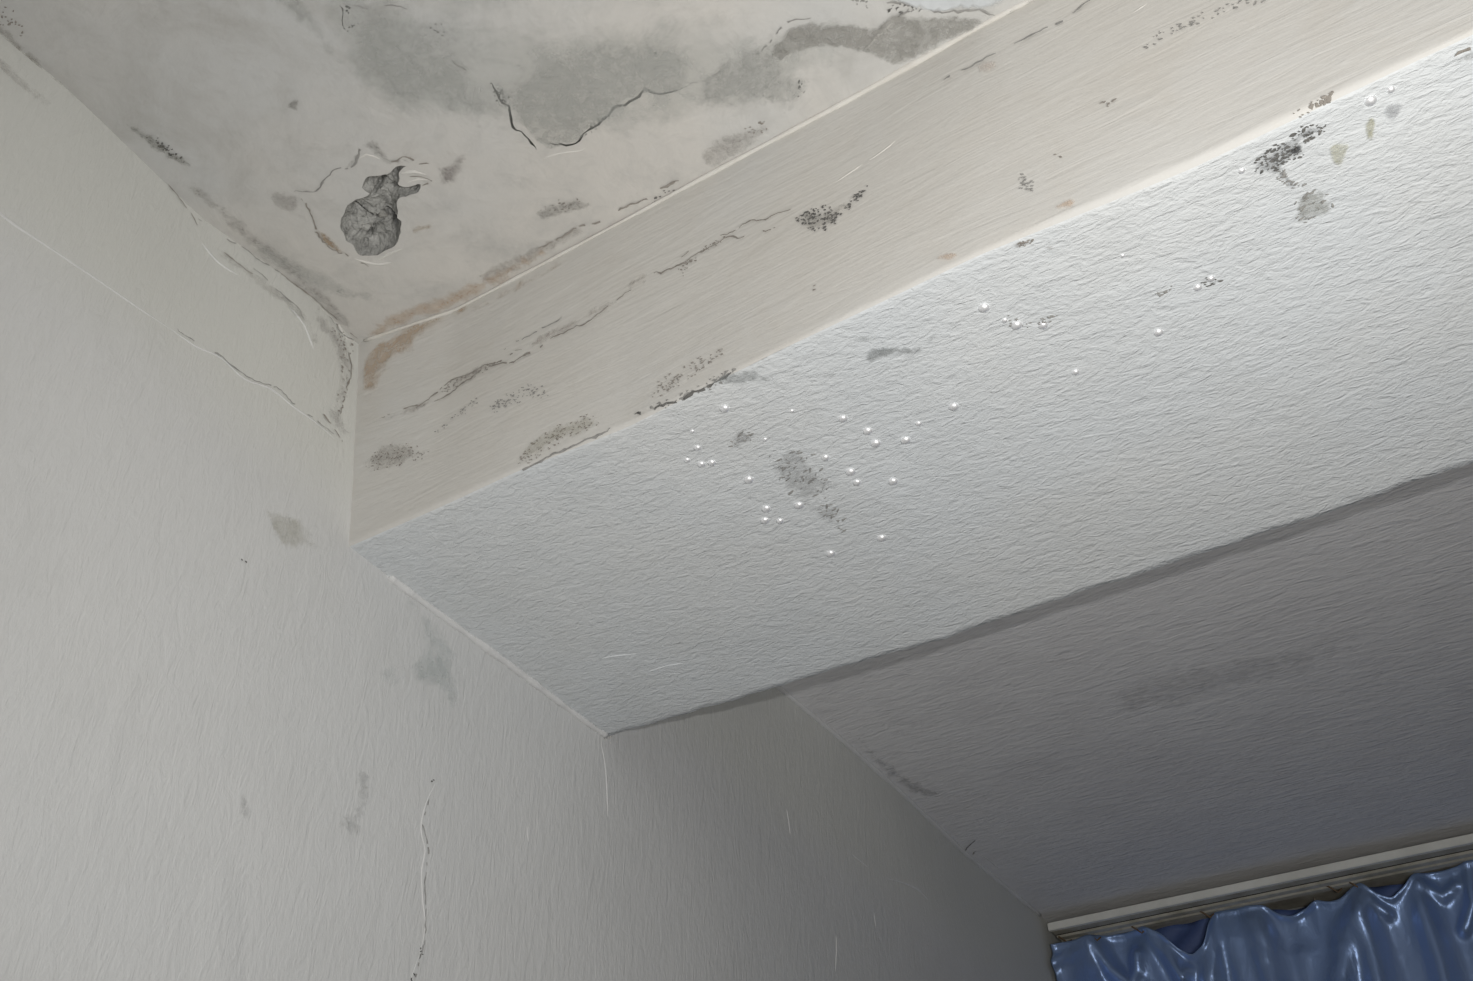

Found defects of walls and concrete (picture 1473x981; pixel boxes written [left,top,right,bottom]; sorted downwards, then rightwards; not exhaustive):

leakage [757,4,978,62]
peeling [888,0,998,16]
crack [453,61,721,159]
leakage [1254,91,1334,223]
flaking render [294,149,432,267]
leakage [654,185,868,274]
leakage [382,290,630,418]
leakage [769,450,846,533]
crack [410,779,435,981]